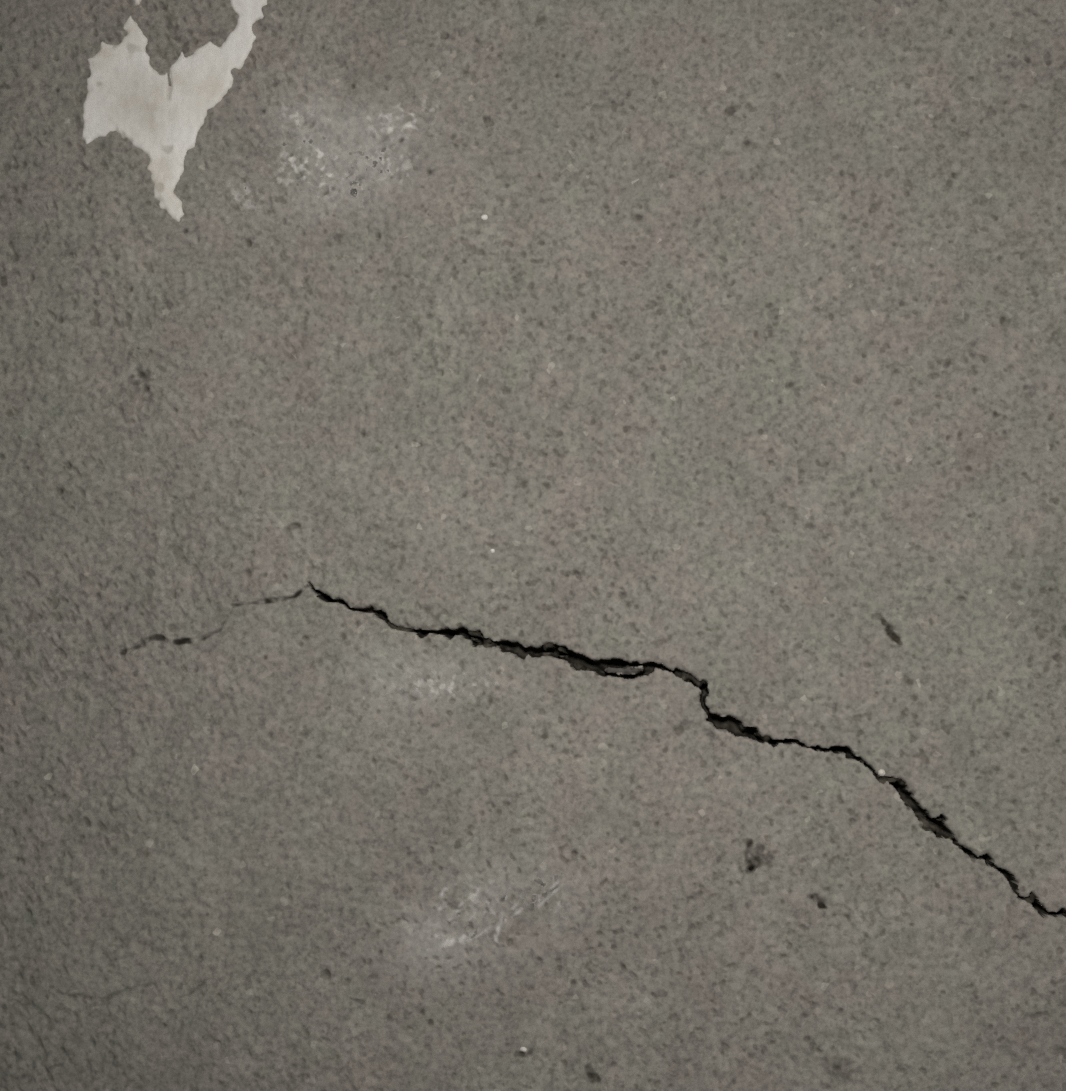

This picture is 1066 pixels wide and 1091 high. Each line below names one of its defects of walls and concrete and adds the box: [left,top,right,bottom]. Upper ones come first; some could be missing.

peeling [82,0,267,222]
crack [122,635,205,654]
crack [266,583,1066,918]